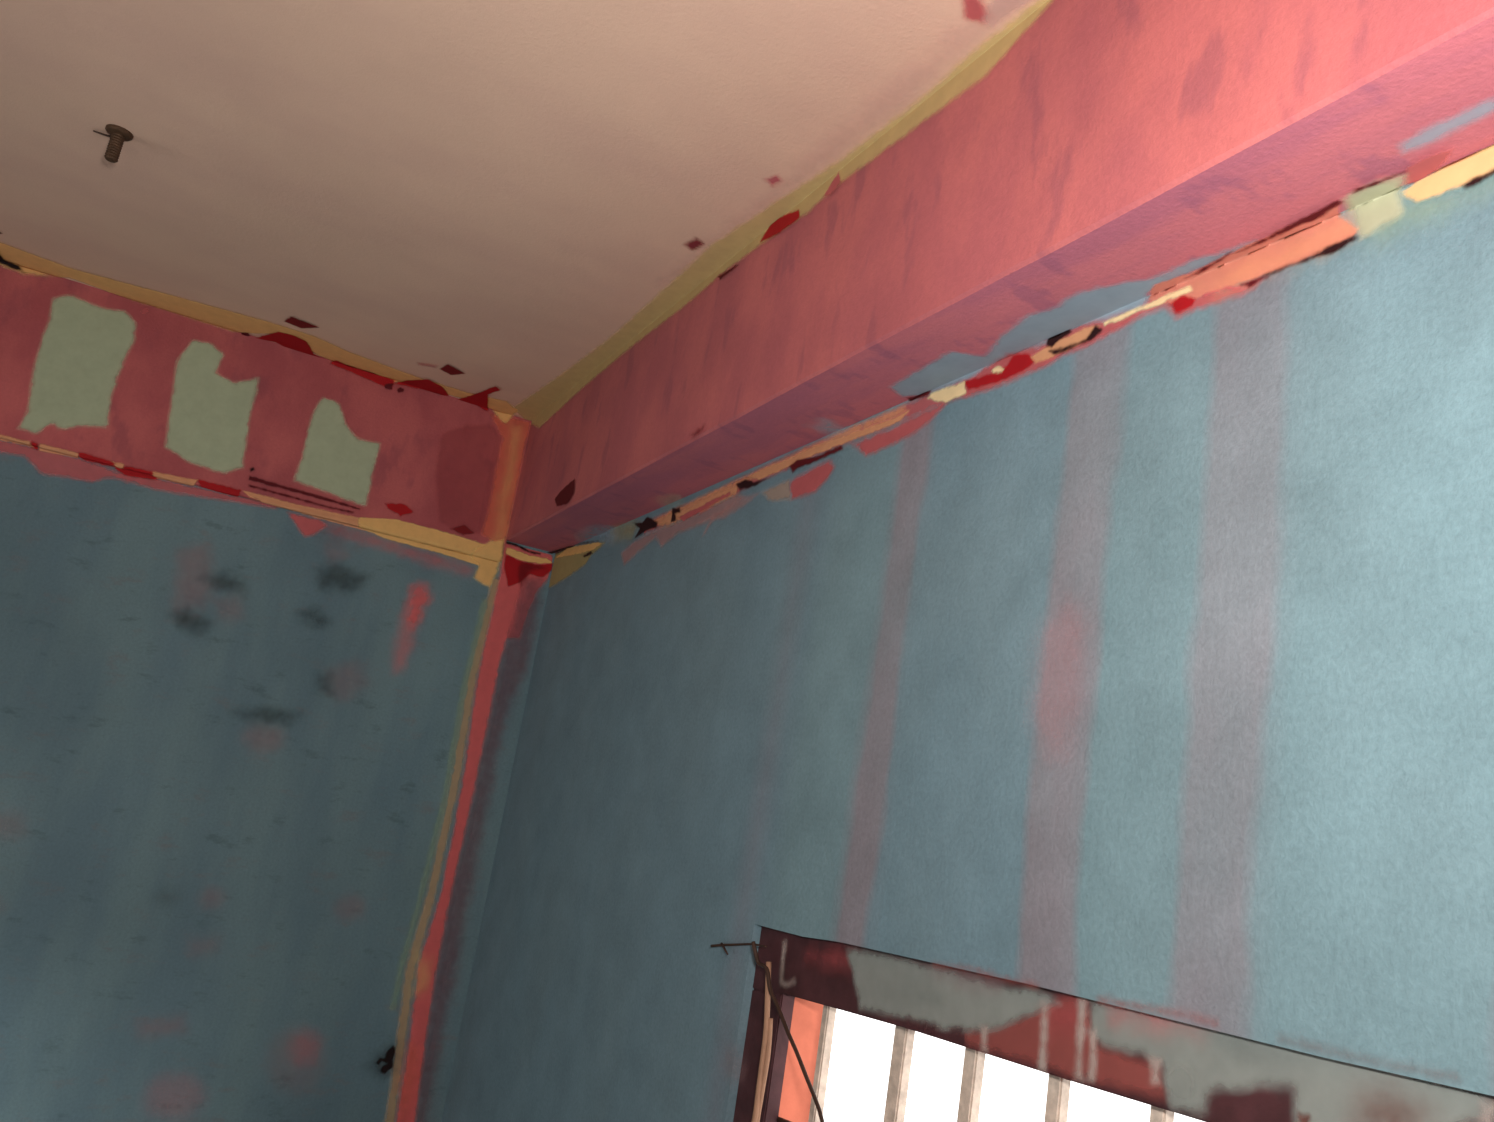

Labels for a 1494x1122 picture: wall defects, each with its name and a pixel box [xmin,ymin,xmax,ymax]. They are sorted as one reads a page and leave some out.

peeling [0,435,604,638]
peeling [635,144,1494,538]